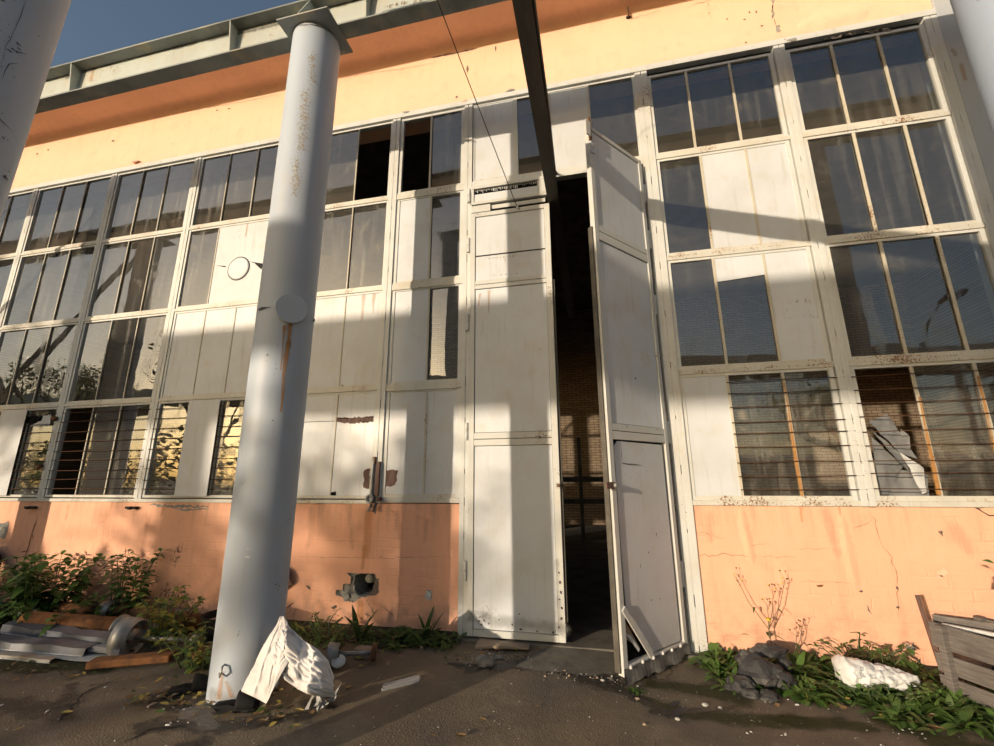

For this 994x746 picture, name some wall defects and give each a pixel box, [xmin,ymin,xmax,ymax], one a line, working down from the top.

corrosion [280,324,292,412]
spalling [331,566,386,616]
crack [853,508,899,618]